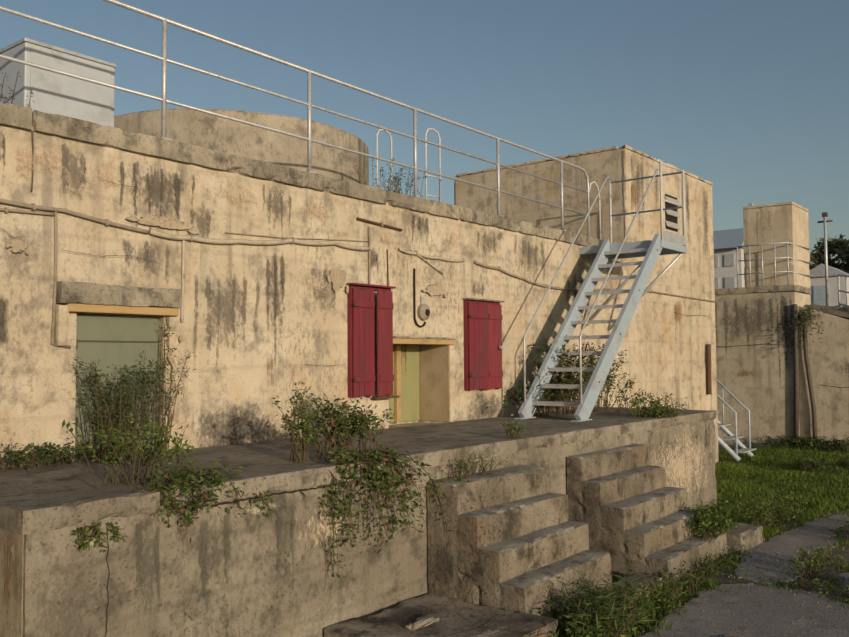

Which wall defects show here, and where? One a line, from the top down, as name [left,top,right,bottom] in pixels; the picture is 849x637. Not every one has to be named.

water stain [120,163,182,218]
water stain [191,202,211,236]
water stain [194,257,285,355]
water stain [715,296,793,371]